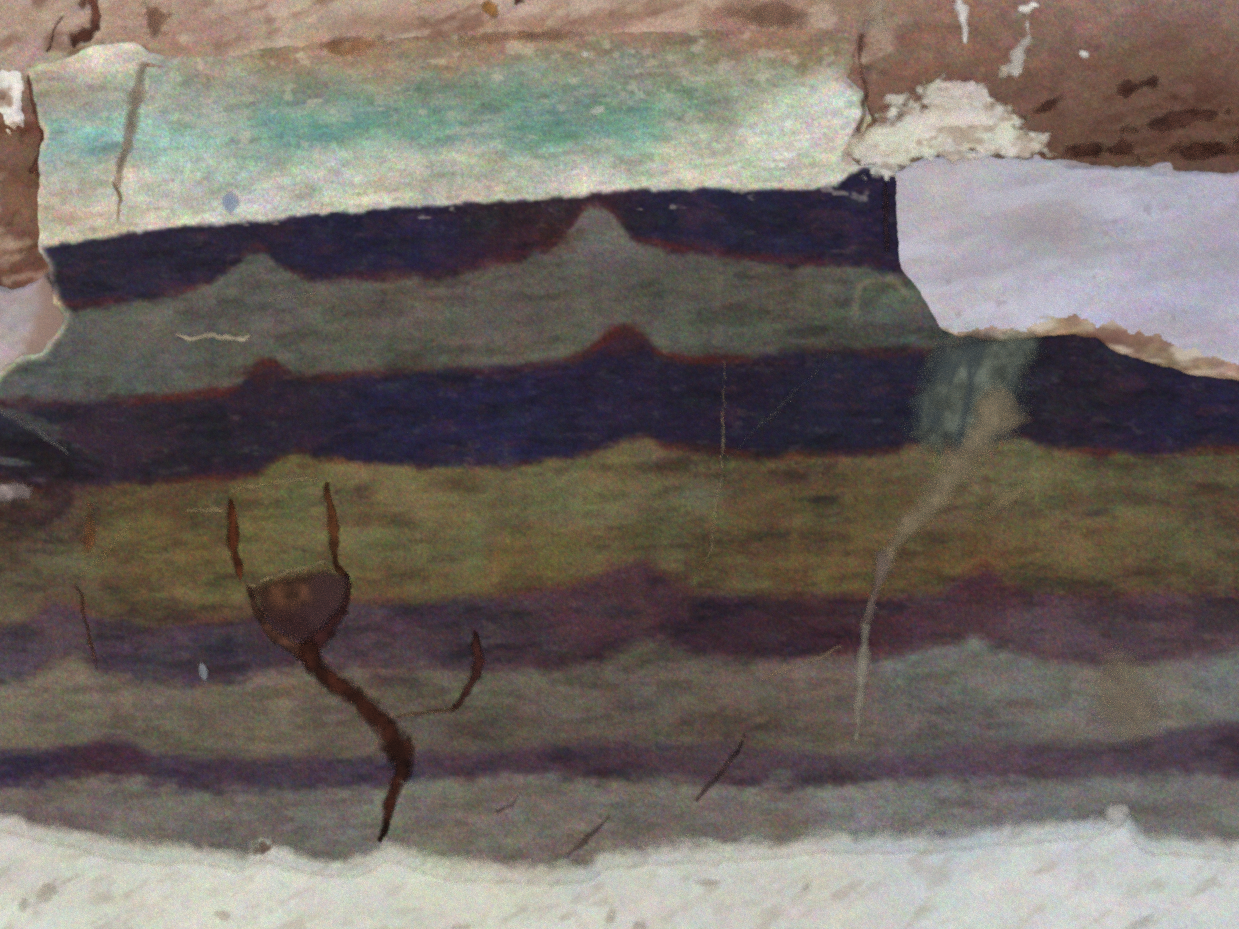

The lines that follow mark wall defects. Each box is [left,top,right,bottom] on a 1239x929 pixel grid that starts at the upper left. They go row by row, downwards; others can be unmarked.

crack [46,0,100,51]
crack [27,75,44,173]
crack [112,63,145,217]
spalling [1039,99,1057,112]
spalling [1066,127,1132,157]
spalling [1118,76,1158,98]
spalling [1150,110,1229,131]
spalling [1181,140,1239,160]
spalling [940,314,1239,380]
leakage [855,335,1035,740]